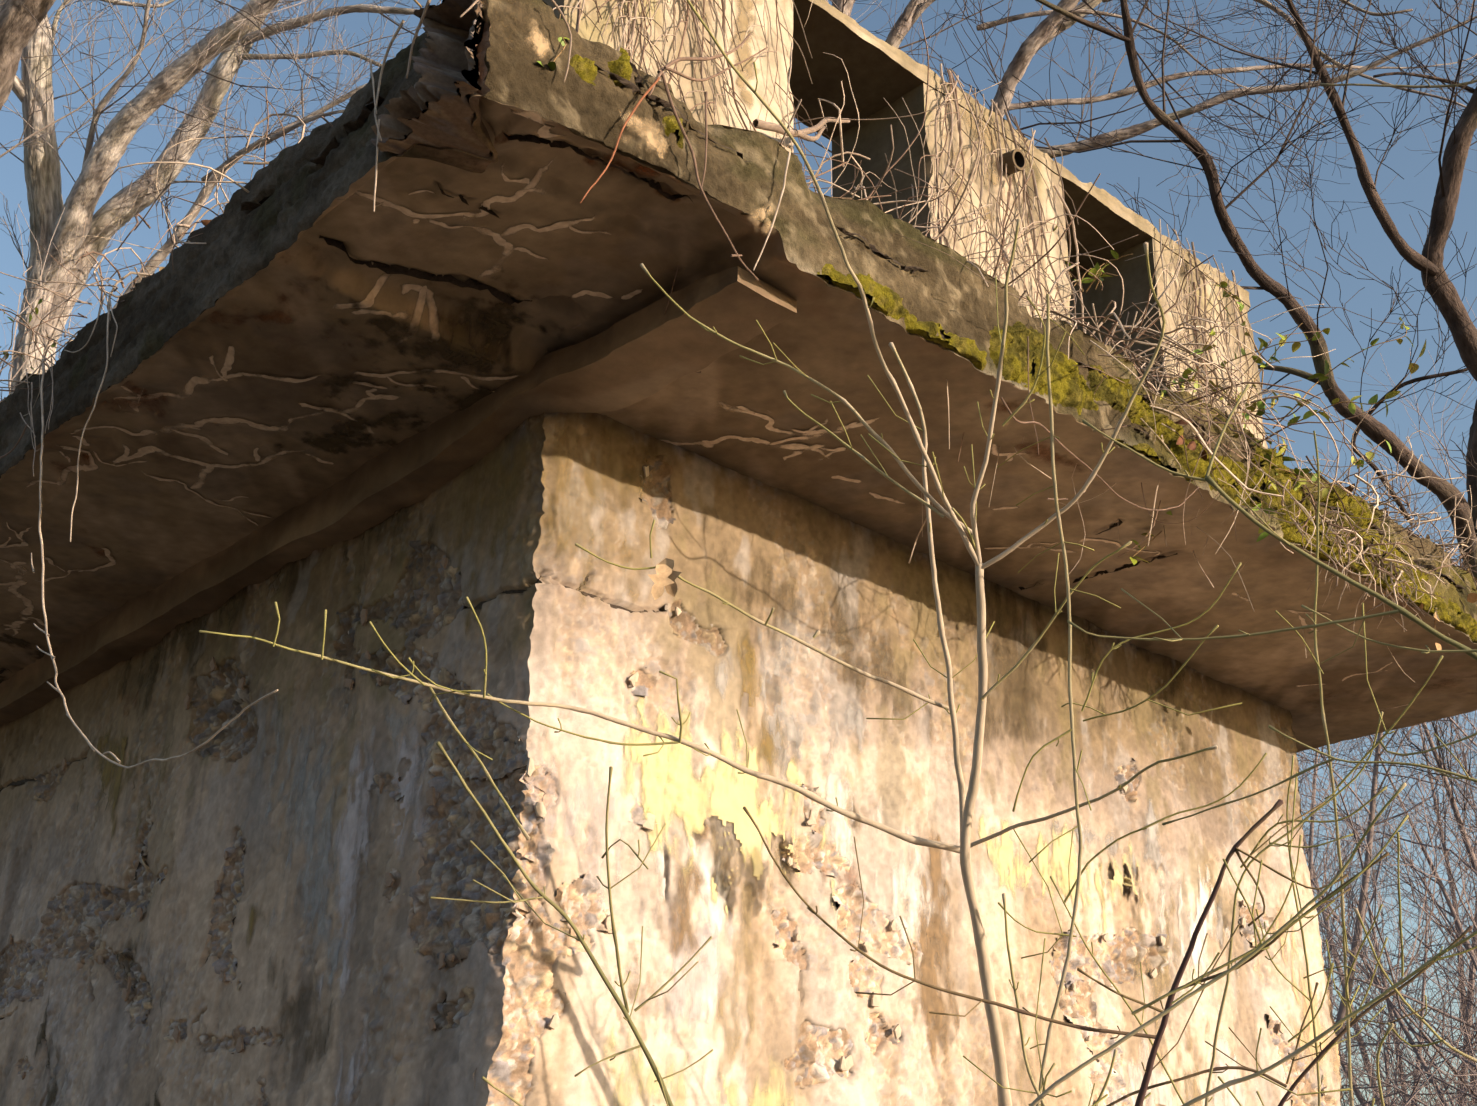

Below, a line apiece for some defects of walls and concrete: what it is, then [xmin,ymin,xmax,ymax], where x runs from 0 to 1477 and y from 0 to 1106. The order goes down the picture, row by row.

spalling [370,0,492,158]
crack [319,235,532,305]
water stain [991,444,1025,462]
crack [473,572,662,613]
water stain [984,538,1160,556]
spalling [184,657,259,762]
spalling [332,540,620,1106]
spalling [0,819,168,1030]
spalling [207,828,246,991]
spalling [771,907,810,971]
spalling [778,783,924,1089]
spalling [164,1019,285,1054]